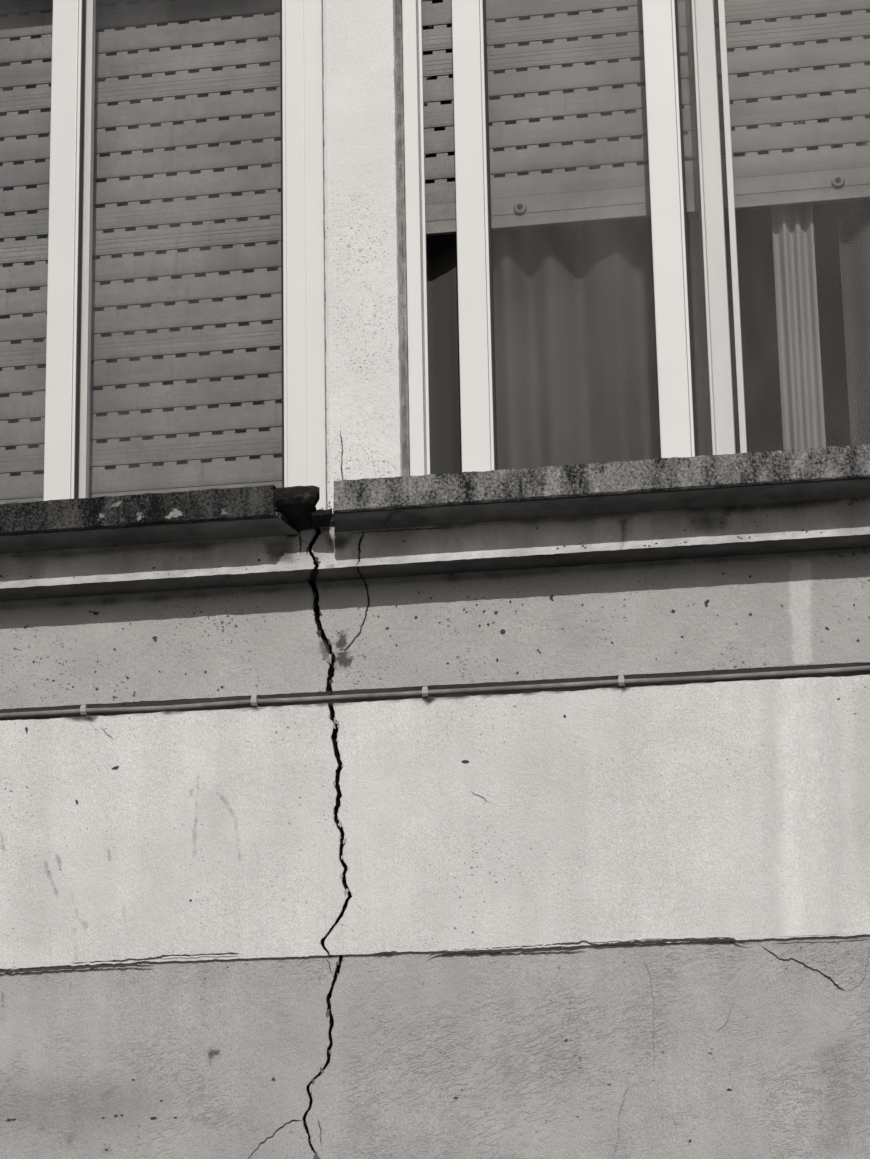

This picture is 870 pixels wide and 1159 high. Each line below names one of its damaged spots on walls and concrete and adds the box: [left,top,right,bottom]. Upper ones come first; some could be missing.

crack [249,513,441,1159]
crack [759,944,870,991]